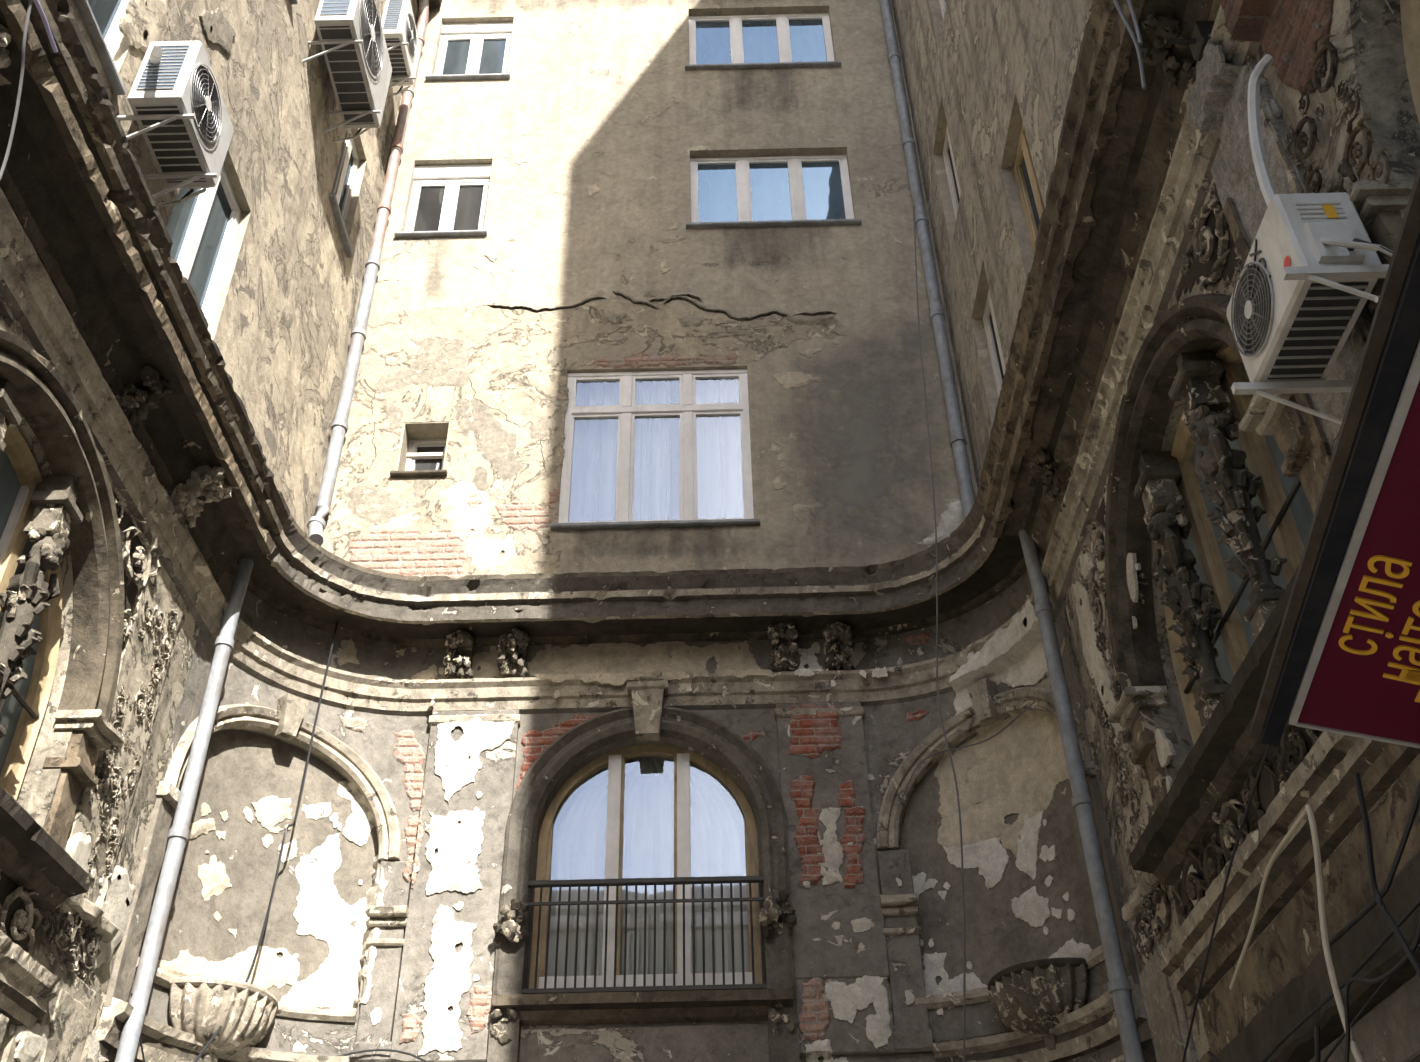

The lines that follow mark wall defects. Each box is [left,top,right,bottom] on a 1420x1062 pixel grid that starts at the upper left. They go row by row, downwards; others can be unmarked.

peeling [1185,0,1334,220]
crack [487,291,836,321]
peeling [325,300,848,578]
peeling [527,641,774,699]
peeling [794,642,836,687]
flaking render [787,703,866,889]
peeling [934,598,1092,959]
peeling [59,833,137,970]
peeling [157,714,600,1062]
peeling [8,1023,50,1062]
peeling [86,1030,109,1062]
peeling [799,938,988,1062]